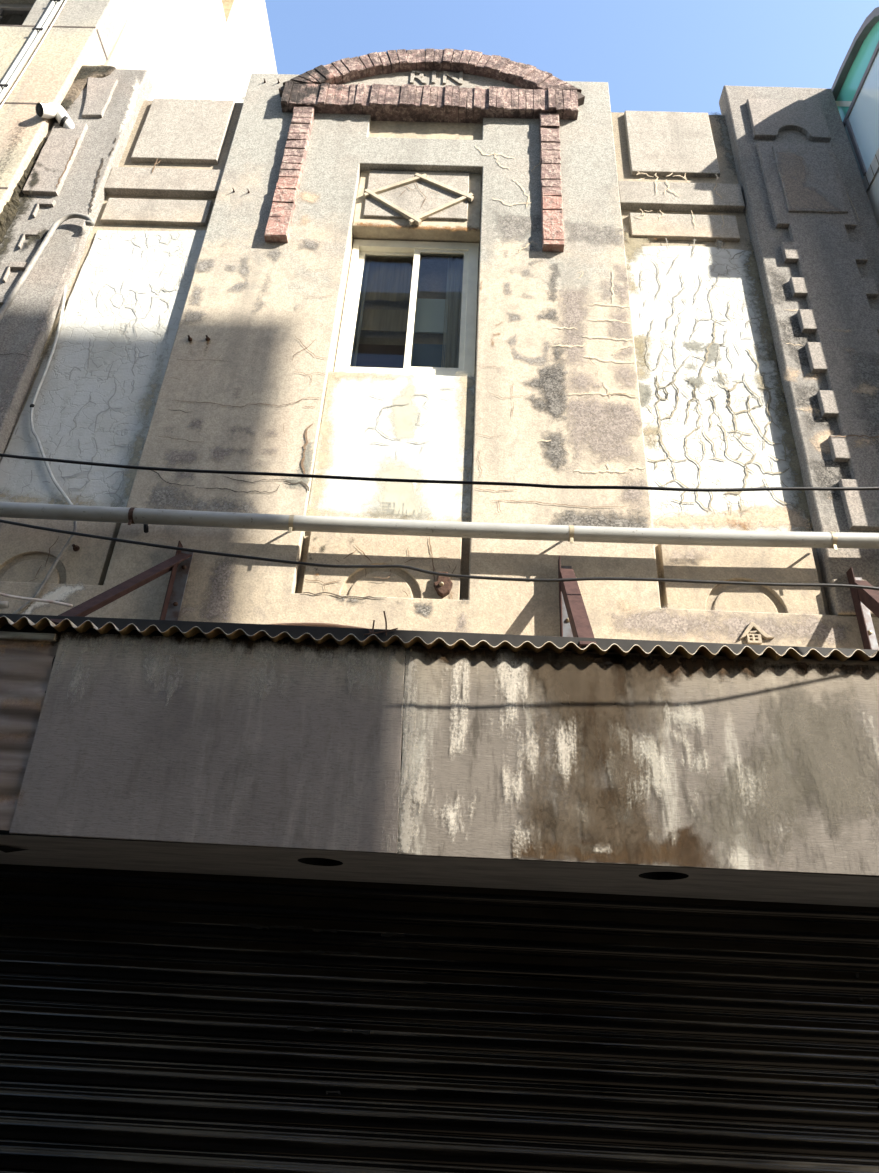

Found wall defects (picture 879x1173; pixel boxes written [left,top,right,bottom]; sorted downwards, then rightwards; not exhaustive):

leakage [0,137,56,258]
leakage [0,229,86,411]
crack [0,138,323,504]
crack [475,145,540,207]
crack [476,366,625,512]
leakage [624,233,649,291]
leakage [634,335,651,406]
leakage [685,341,724,387]
crack [552,171,879,515]
leakage [744,244,814,532]
crack [303,537,457,599]
leakage [55,631,879,868]